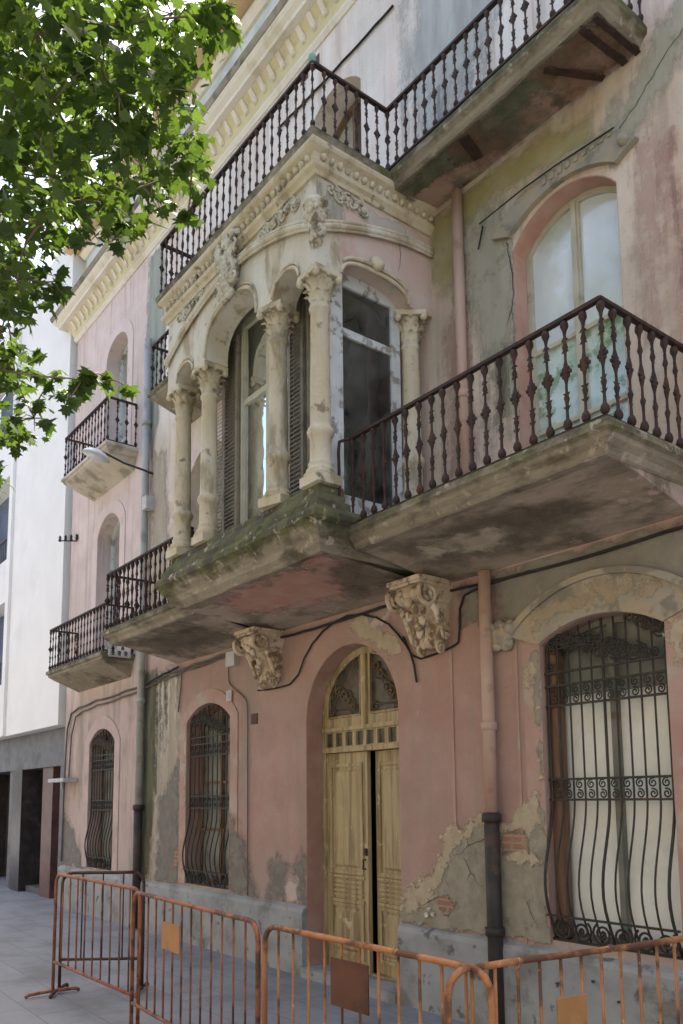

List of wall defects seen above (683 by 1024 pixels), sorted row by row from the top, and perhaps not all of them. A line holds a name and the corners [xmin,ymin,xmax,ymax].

leakage [400,0,499,131]
leakage [403,23,605,202]
crack [506,242,515,338]
leakage [416,527,511,560]
peeling [349,610,402,662]
peeling [522,651,541,726]
leakage [141,665,181,884]
flaking render [400,812,487,935]
flaking render [499,741,551,945]